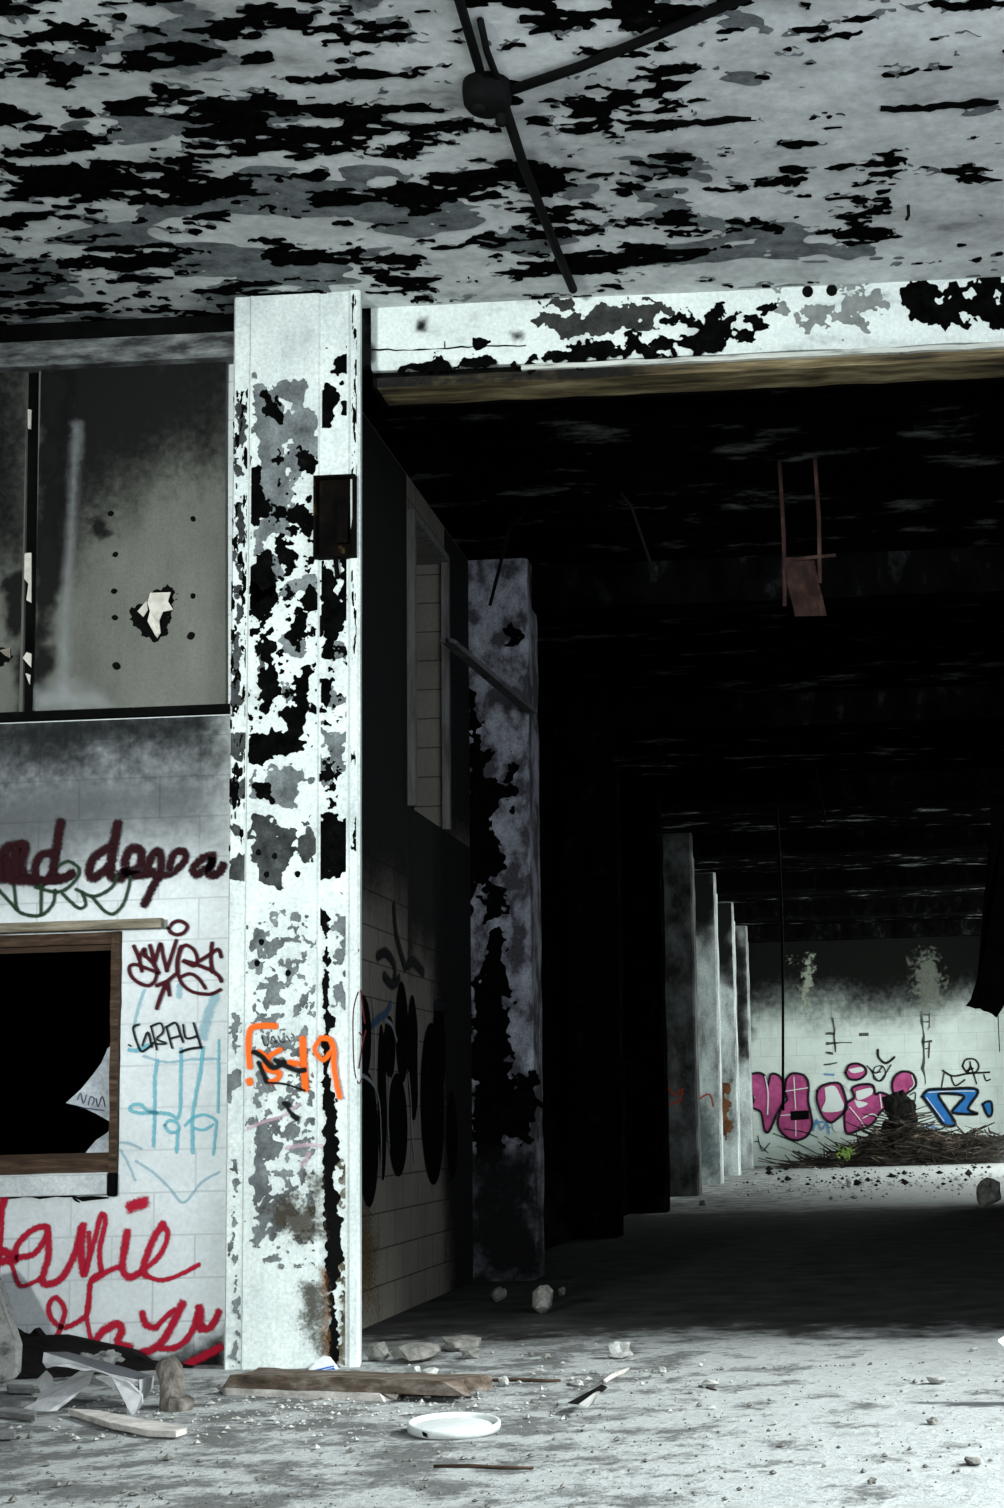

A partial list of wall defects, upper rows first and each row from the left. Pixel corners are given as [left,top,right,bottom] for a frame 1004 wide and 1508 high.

peeling [0,0,1004,891]
spalling [227,902,346,1370]
peeling [469,688,545,1156]
peeling [722,1079,734,1140]